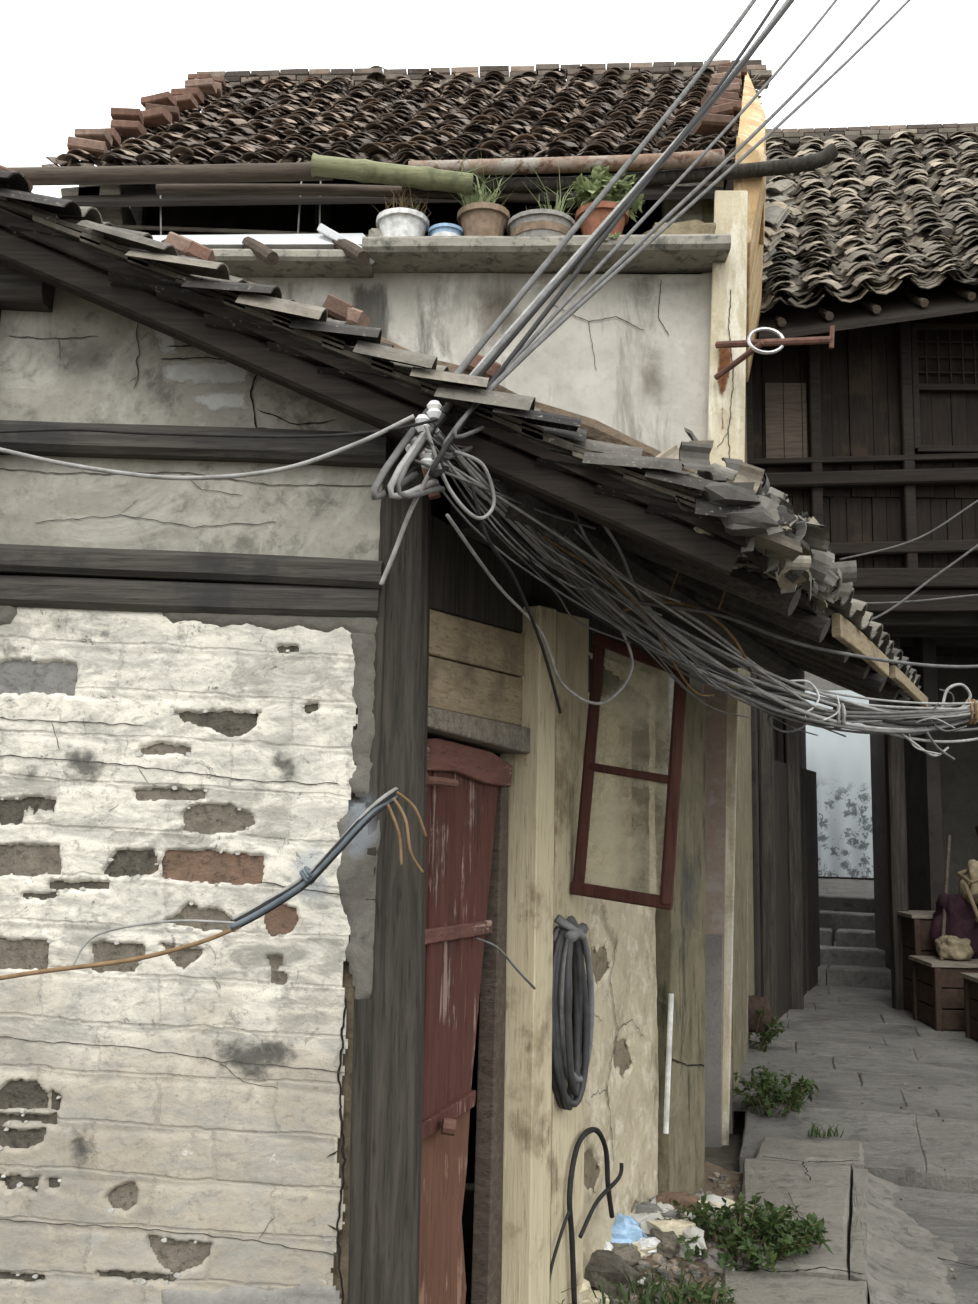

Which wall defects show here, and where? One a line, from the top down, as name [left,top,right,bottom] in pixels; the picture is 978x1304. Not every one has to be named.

leakage [353,287,387,337]
crack [11,336,91,348]
crack [132,323,222,388]
crack [250,375,332,428]
corrosion [717,348,731,429]
crack [0,468,372,528]
flaking render [0,657,78,696]
flaking render [169,709,259,737]
flaking render [0,786,265,900]
flaking render [167,902,236,932]
flaking render [0,938,52,970]
flaking render [88,941,145,975]